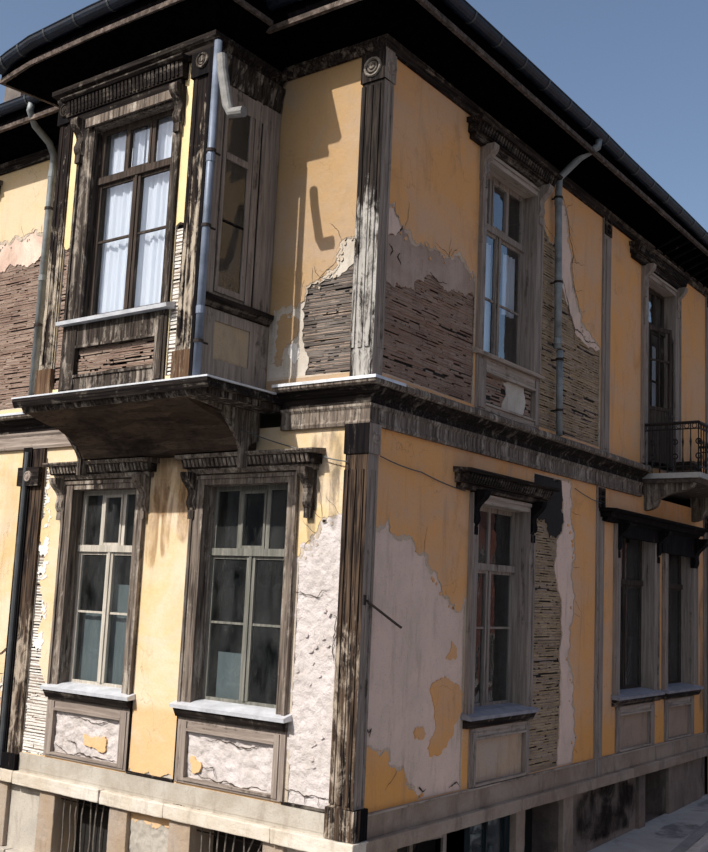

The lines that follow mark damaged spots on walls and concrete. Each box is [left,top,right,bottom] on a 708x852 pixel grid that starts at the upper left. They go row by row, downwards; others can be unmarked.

flaking render [267,236,355,381]
flaking render [37,484,52,580]
flaking render [33,631,44,652]
flaking render [284,491,342,809]
flaking render [367,519,466,800]
flaking render [53,711,120,764]
flaking render [187,731,273,794]
flaking render [128,812,169,852]